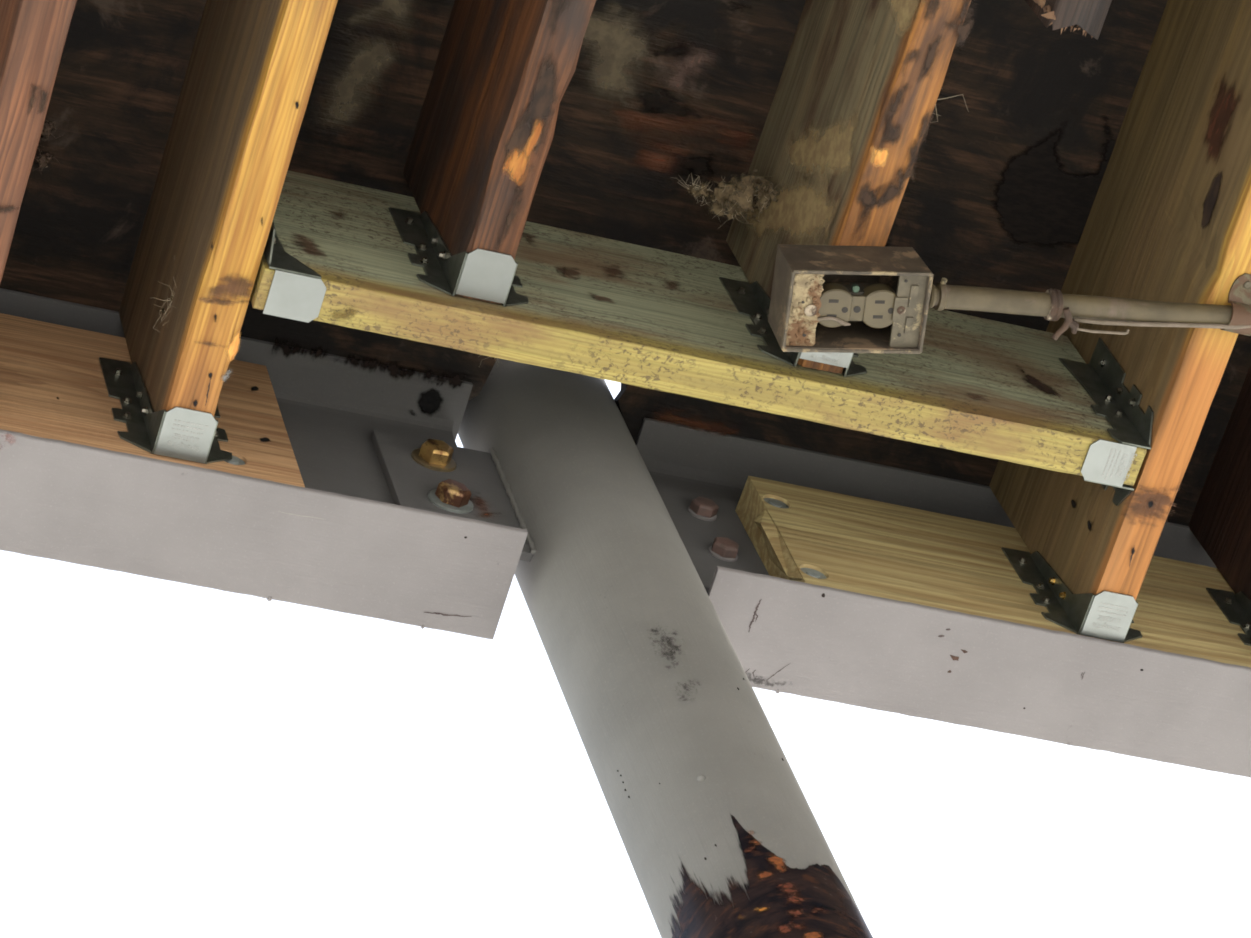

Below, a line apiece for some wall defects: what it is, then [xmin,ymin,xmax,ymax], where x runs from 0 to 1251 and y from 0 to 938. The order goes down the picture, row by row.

water stain [903,0,973,78]
water stain [879,84,907,149]
water stain [856,111,934,231]
peeling [669,815,873,938]